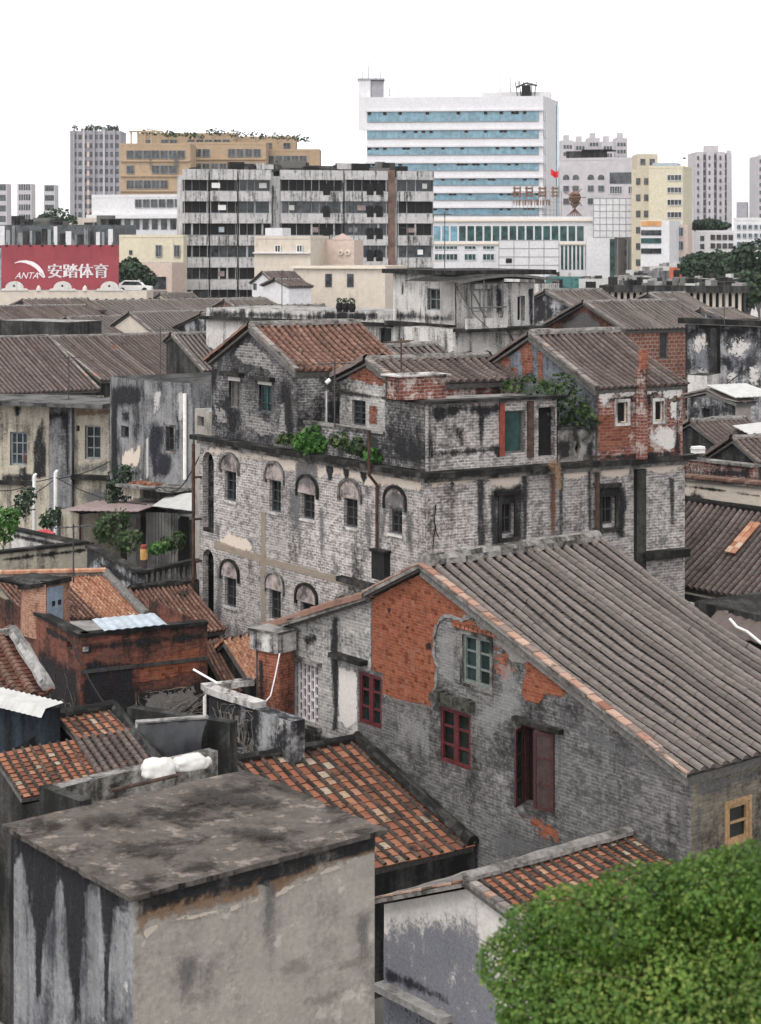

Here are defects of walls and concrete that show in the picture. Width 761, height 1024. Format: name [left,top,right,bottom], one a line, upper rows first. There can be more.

leakage [690,328,757,371]
leakage [2,384,183,503]
leakage [389,404,499,465]
flaking render [598,414,632,453]
peeling [647,399,681,454]
flaking render [372,575,480,711]
flaking render [522,661,567,704]
leakage [13,836,375,1021]
leakage [384,917,498,1024]